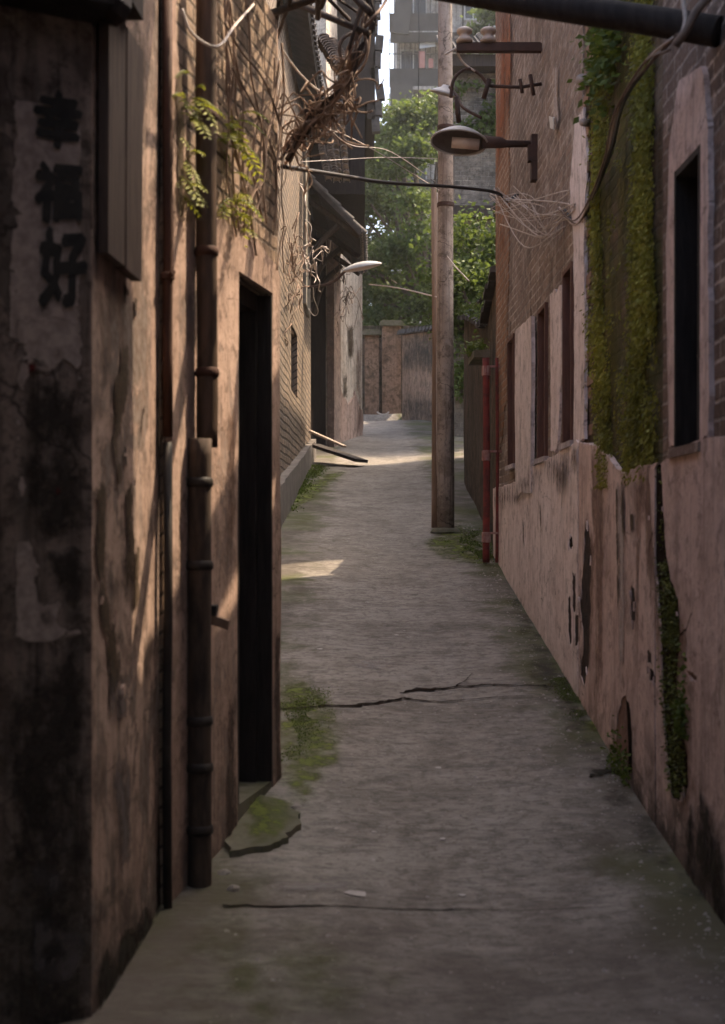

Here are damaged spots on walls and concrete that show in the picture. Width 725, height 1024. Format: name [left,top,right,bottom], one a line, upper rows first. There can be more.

flaking render [567,521,592,685]
crack [450,673,546,701]